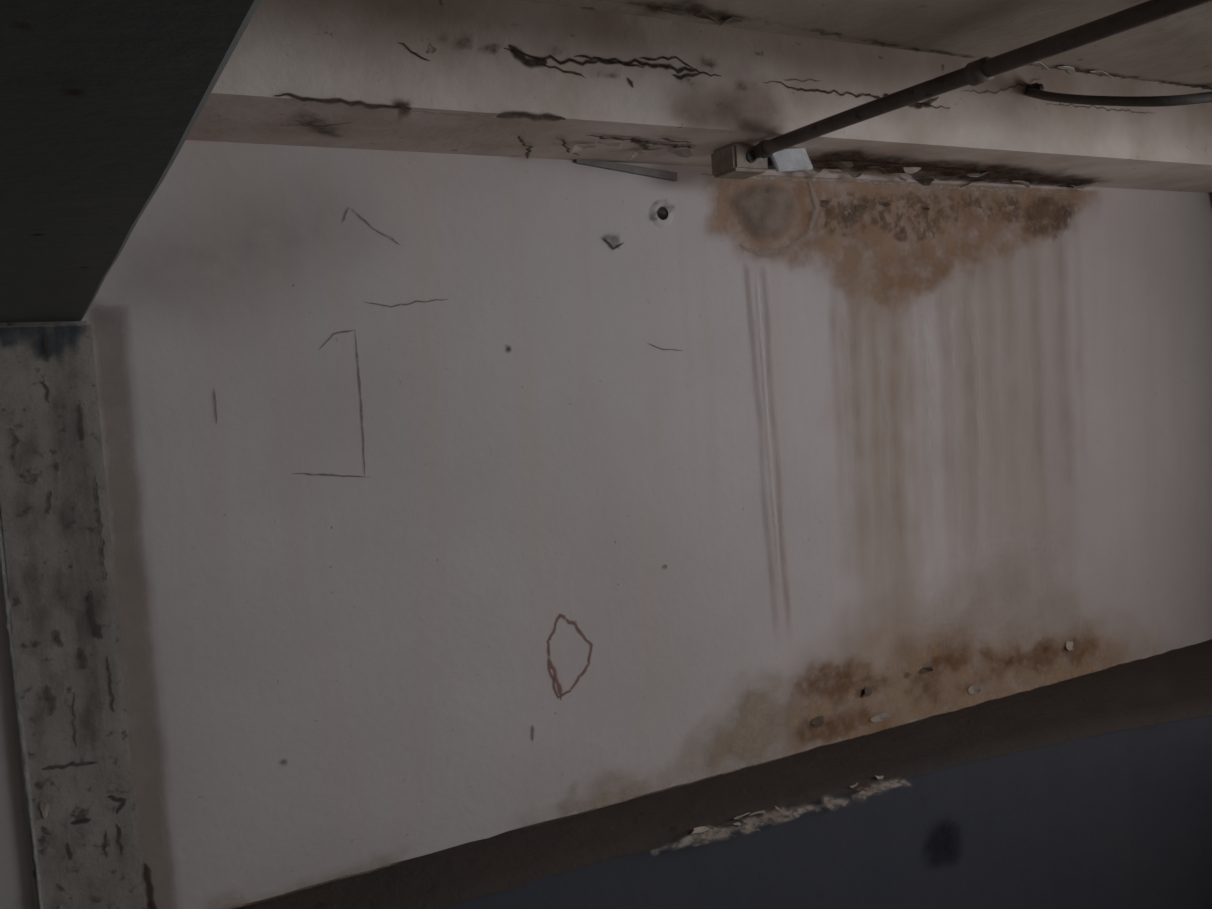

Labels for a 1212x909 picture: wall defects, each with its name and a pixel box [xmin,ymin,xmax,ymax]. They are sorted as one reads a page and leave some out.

crack [399,43,430,61]
crack [275,93,693,159]
crack [487,45,720,88]
crack [764,78,1149,114]
spalling [750,151,1098,241]
water stain [716,174,1084,303]
spalling [665,776,910,848]